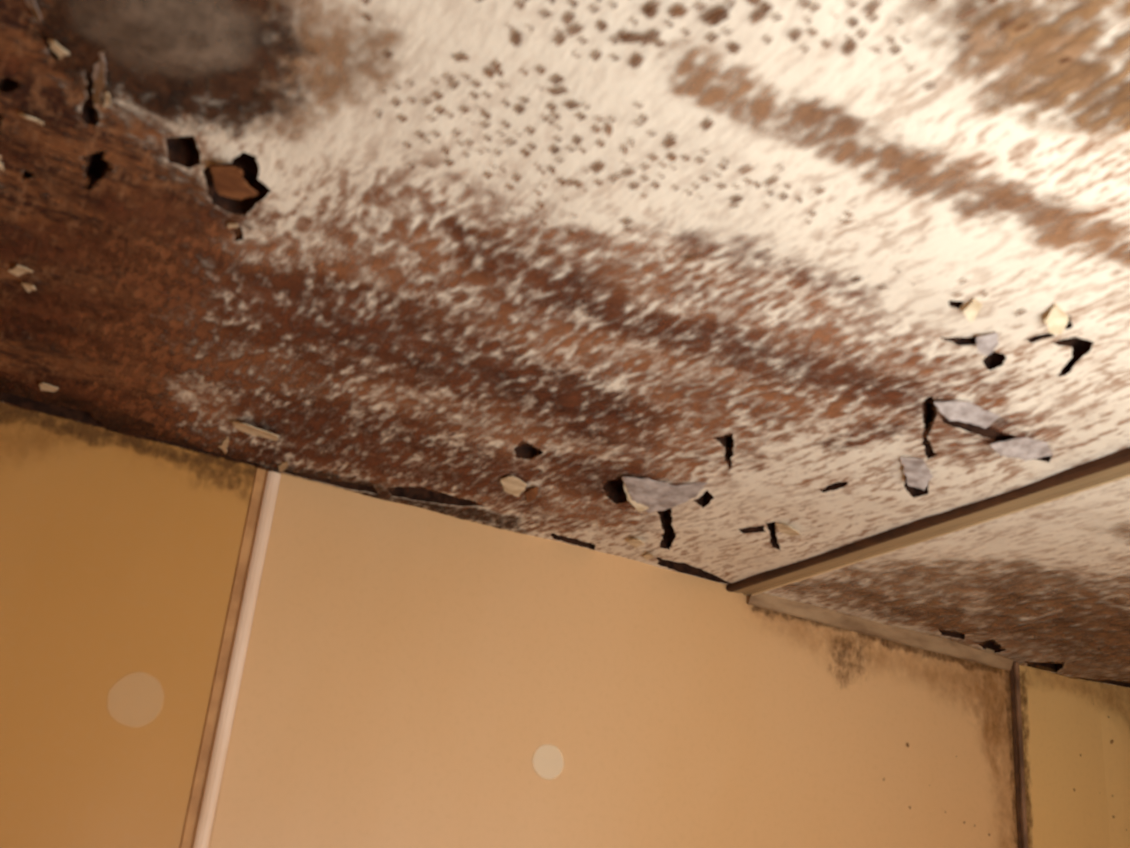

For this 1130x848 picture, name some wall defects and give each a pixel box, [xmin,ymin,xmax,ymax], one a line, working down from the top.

peeling [79,50,111,126]
peeling [81,150,113,191]
peeling [165,136,271,242]
leakage [0,0,1130,533]
peeling [940,332,1006,370]
peeling [1025,304,1094,376]
peeling [500,476,539,503]
peeling [602,476,714,560]
peeling [713,433,734,472]
peeling [738,522,801,550]
peeling [900,395,1053,498]
leakage [782,560,1130,844]